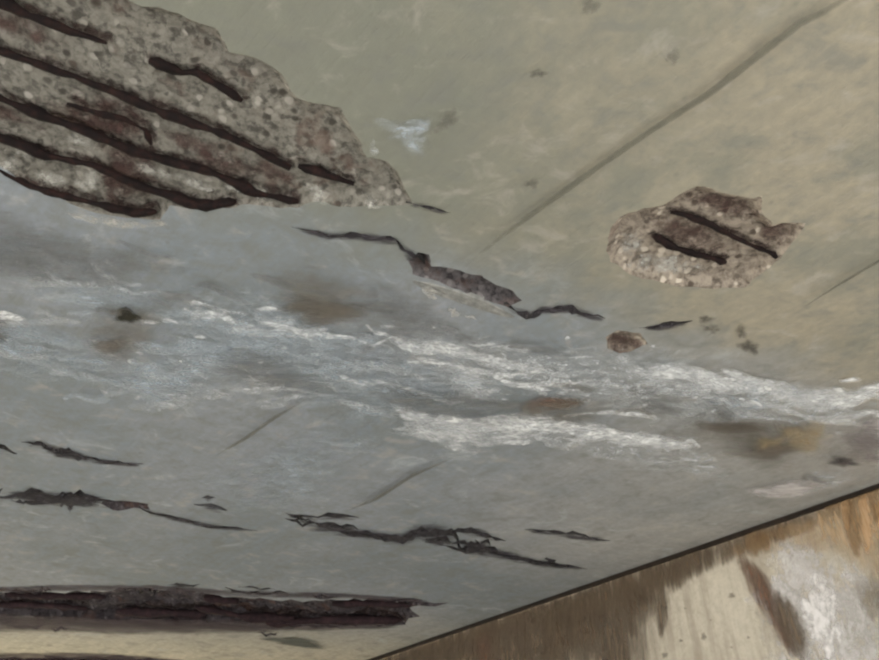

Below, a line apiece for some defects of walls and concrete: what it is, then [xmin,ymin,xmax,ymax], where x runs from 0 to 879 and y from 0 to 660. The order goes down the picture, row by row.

spalling [0,0,413,220]
crack [293,227,605,320]
spalling [606,186,805,289]
spalling [606,330,648,353]
damp [0,294,879,477]
crack [0,441,139,466]
crack [0,488,256,531]
crack [285,512,584,569]
damp [756,472,849,497]
spalling [0,583,446,649]
damp [409,583,667,660]
damp [755,543,879,660]